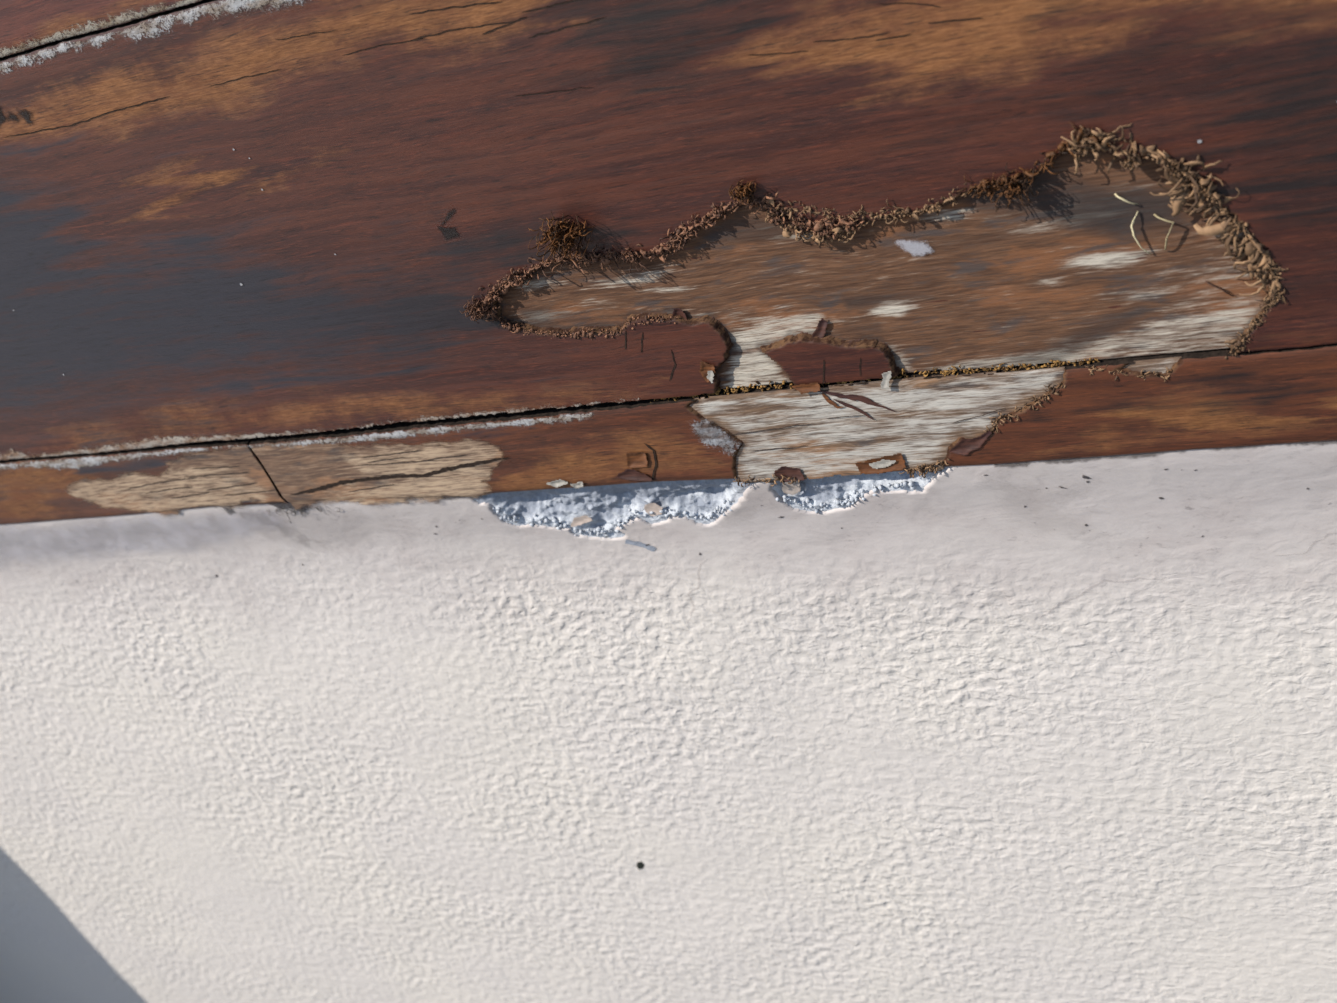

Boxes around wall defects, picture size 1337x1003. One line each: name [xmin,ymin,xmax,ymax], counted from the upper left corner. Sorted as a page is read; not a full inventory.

damp [0,0,302,74]
damp [0,109,32,124]
peeling [812,318,828,338]
peeling [699,361,715,383]
peeling [792,371,895,421]